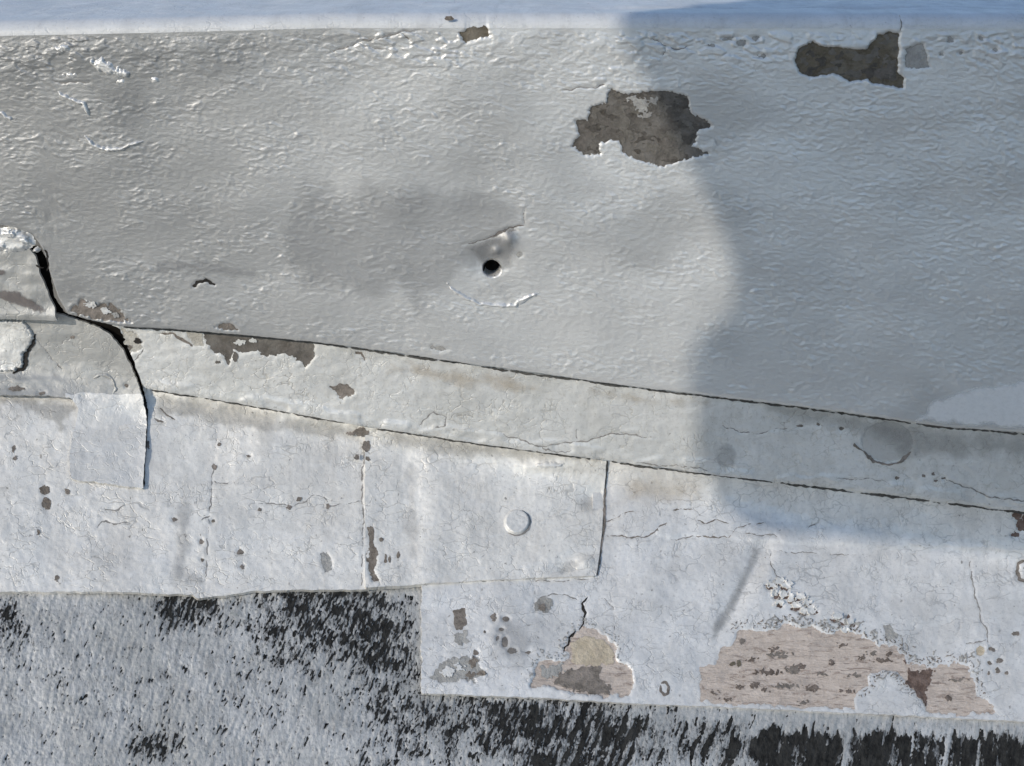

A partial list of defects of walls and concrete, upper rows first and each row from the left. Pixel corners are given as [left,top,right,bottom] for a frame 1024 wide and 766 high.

peeling [459,25,489,43]
peeling [795,31,963,88]
peeling [572,89,718,167]
crack [31,245,193,487]
peeling [186,323,314,367]
peeling [366,526,400,582]
peeling [430,608,487,683]
peeling [484,613,634,699]
crack [532,578,615,653]
peeling [699,577,1008,717]